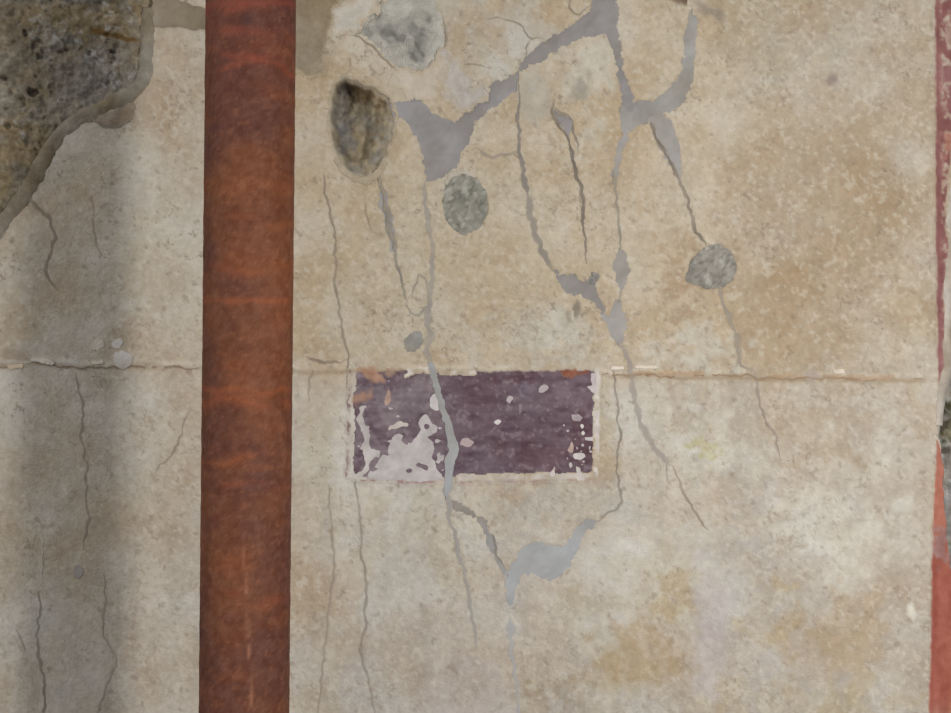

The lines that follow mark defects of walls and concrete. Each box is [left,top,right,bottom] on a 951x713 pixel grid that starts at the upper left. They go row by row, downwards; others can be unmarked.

crack [352,0,396,70]
crack [306,172,350,402]
peeling [347,380,445,482]
peeling [563,414,593,481]
peeling [587,373,597,393]
crack [365,0,924,649]
crack [317,484,335,713]
crack [354,482,376,713]